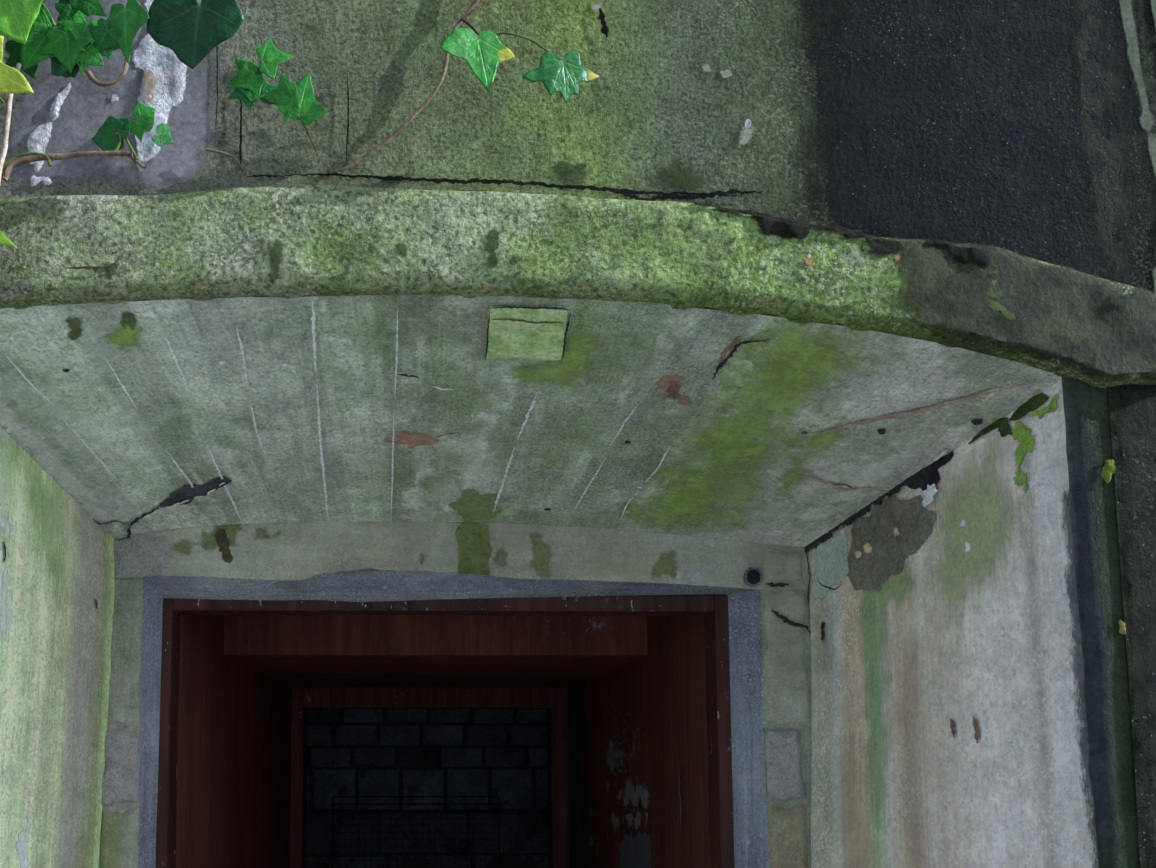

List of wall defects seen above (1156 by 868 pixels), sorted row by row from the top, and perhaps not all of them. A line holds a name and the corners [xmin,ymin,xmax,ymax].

crack [215,45,763,201]
rust [383,432,458,449]
rust [655,374,692,405]
crack [818,381,1035,434]
water stain [801,0,1156,868]
crack [93,476,232,541]
crack [765,450,954,634]
spalling [847,494,936,620]
peeling [606,736,651,868]